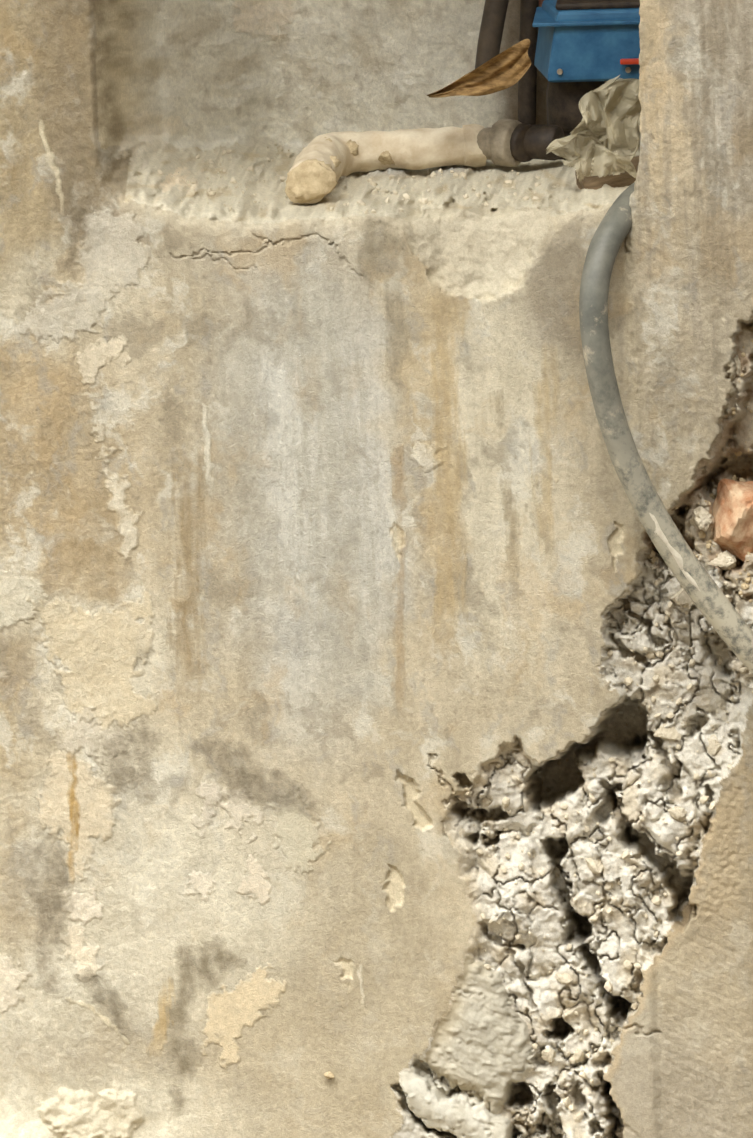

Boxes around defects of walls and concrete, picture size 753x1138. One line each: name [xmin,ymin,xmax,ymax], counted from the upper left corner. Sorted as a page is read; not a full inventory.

crack [171,229,365,279]
rust [66,750,81,885]
leakage [87,708,164,800]
leakage [188,730,321,822]
spalling [391,320,753,1138]
spalling [382,863,409,914]
peeling [199,962,288,1074]